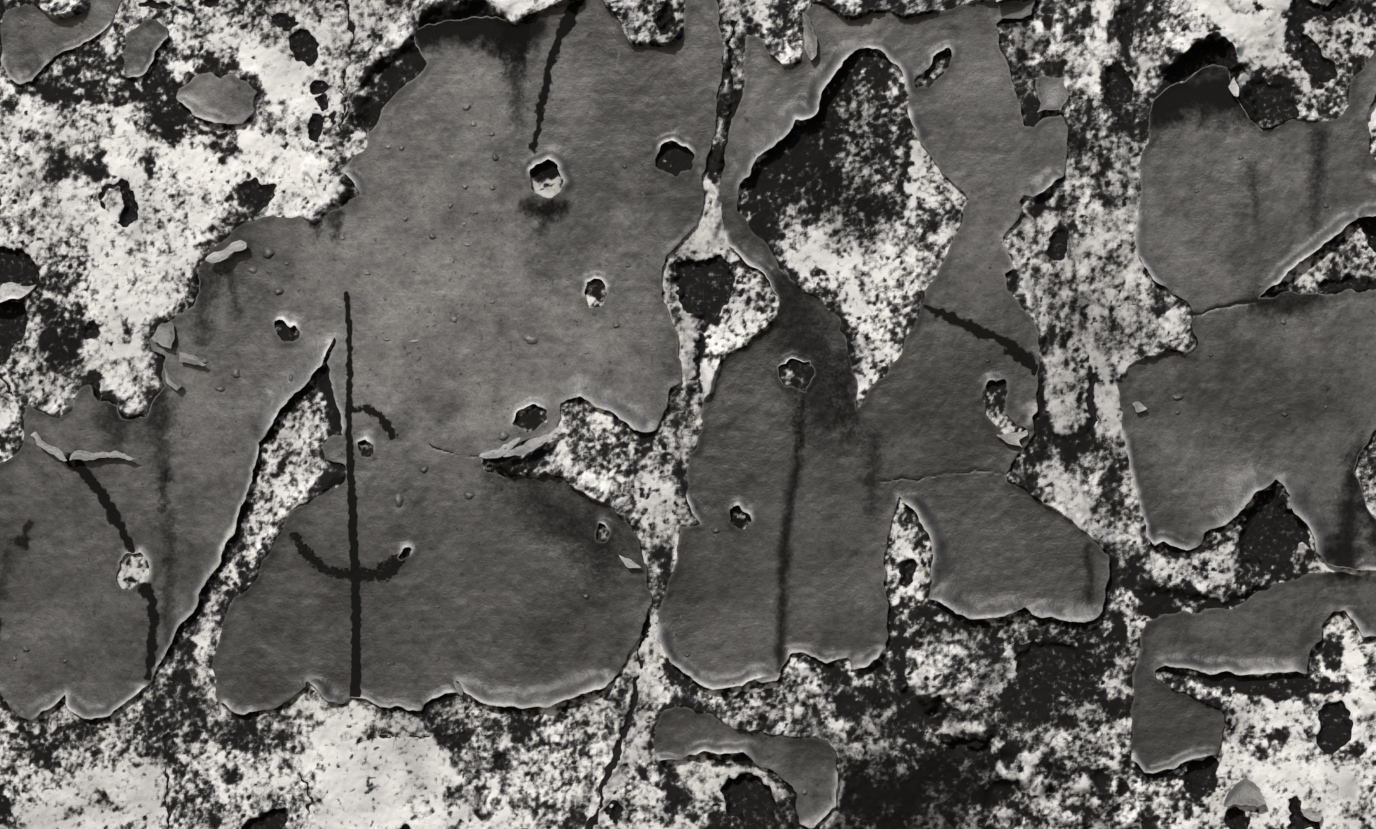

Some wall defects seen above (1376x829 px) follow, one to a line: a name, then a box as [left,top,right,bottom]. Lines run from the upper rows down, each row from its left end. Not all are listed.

damp [415,0,584,153]
peeling [0,0,580,462]
peeling [115,547,157,590]
peeling [149,332,348,690]
damp [346,442,361,697]
peeling [399,542,419,560]
peeling [479,0,1376,829]
peeling [0,667,629,829]
crack [585,615,651,829]